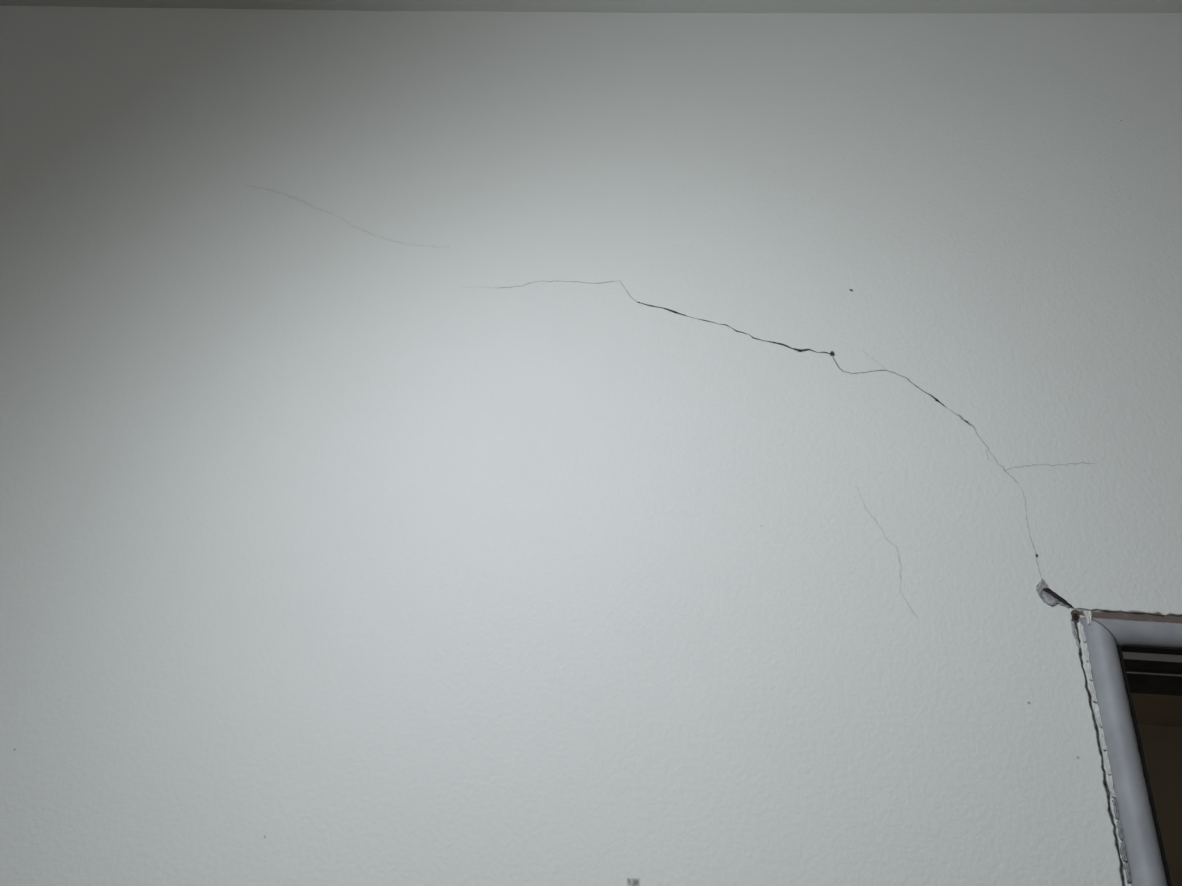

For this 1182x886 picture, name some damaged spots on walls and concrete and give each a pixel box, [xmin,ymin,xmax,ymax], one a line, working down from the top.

crack [638,302,968,423]